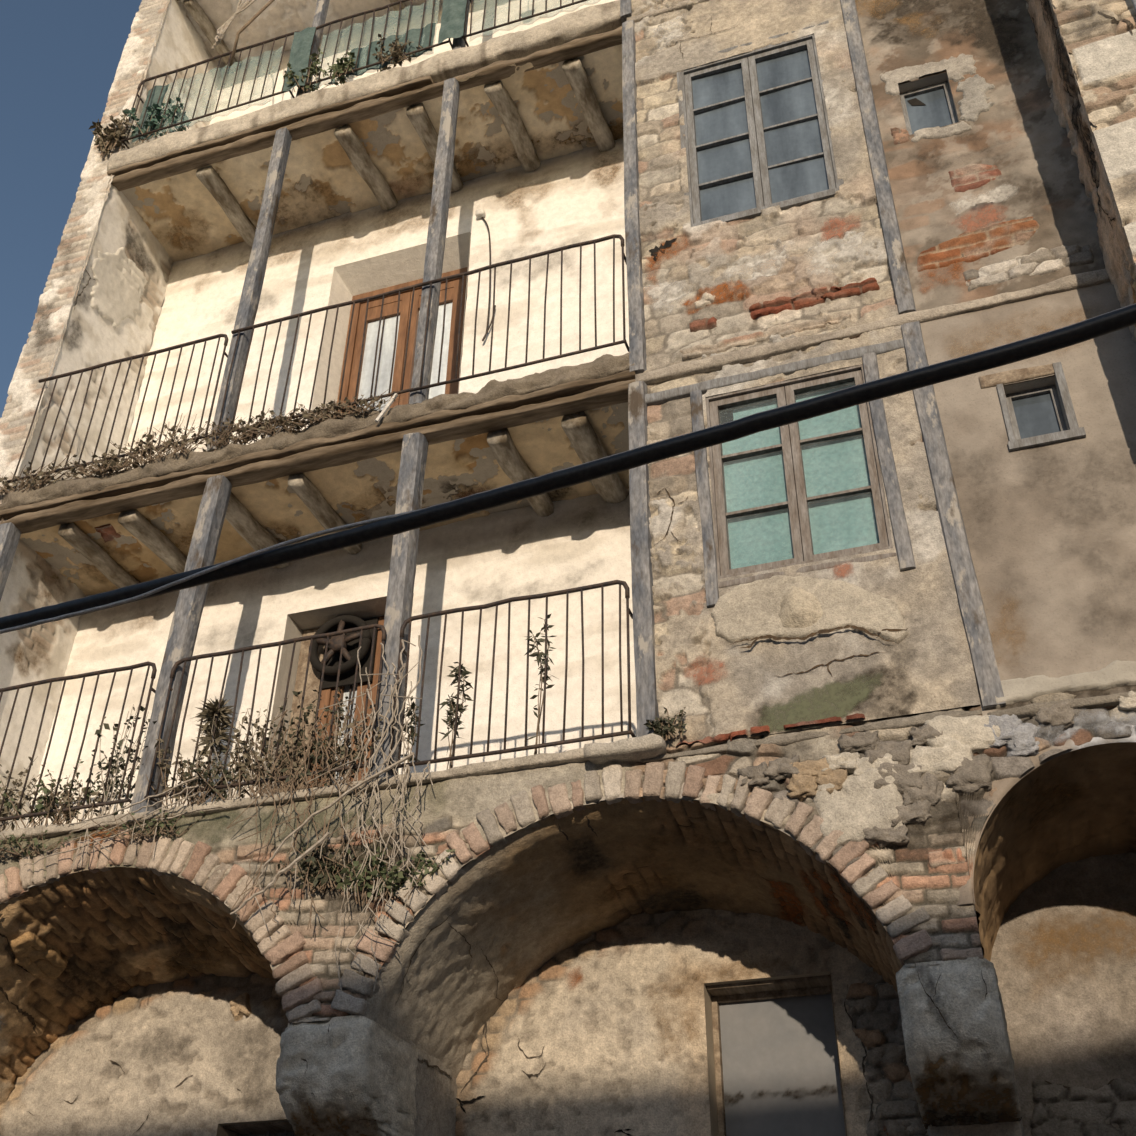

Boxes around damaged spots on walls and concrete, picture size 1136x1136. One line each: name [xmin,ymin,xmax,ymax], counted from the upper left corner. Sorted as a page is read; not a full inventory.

damp [870,0,1024,65]
flaking render [948,163,1017,208]
flaking render [917,217,1094,292]
crack [730,625,908,677]
damp [854,668,916,718]
crack [0,913,30,973]
crack [0,987,37,1034]
crack [396,911,503,1094]
crack [915,968,958,1039]
crack [517,1036,546,1077]